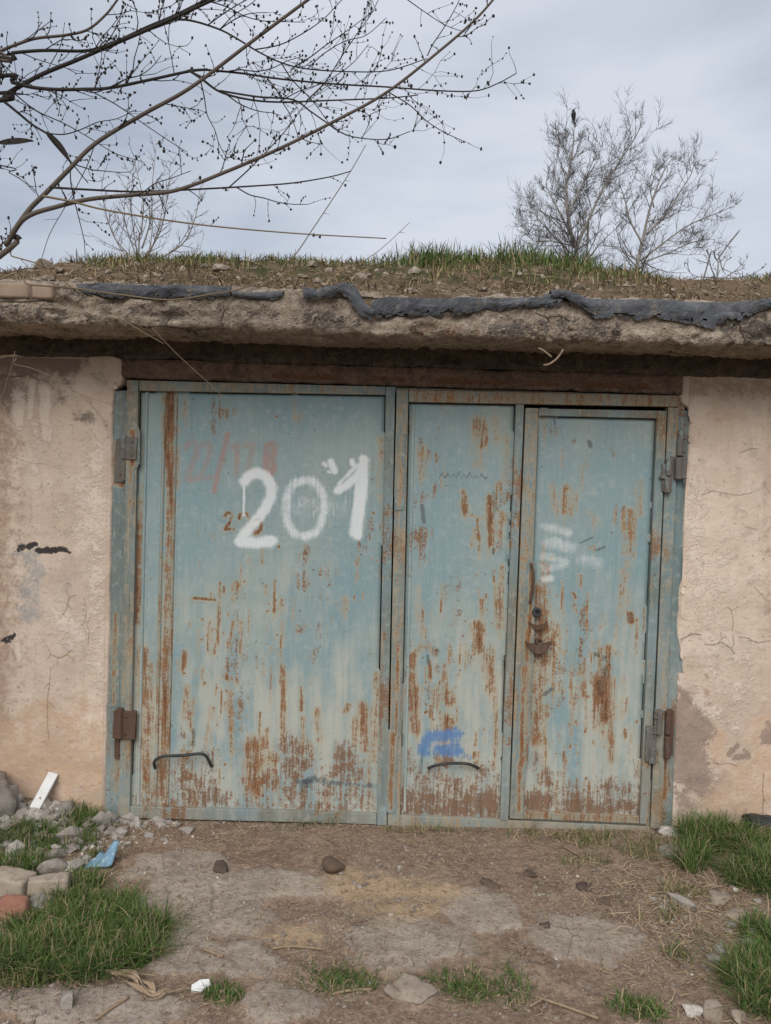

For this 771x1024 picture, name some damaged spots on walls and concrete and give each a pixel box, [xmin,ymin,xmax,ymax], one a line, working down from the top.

rust [109,392,675,829]
crack [681,607,771,654]
water stain [672,673,771,827]